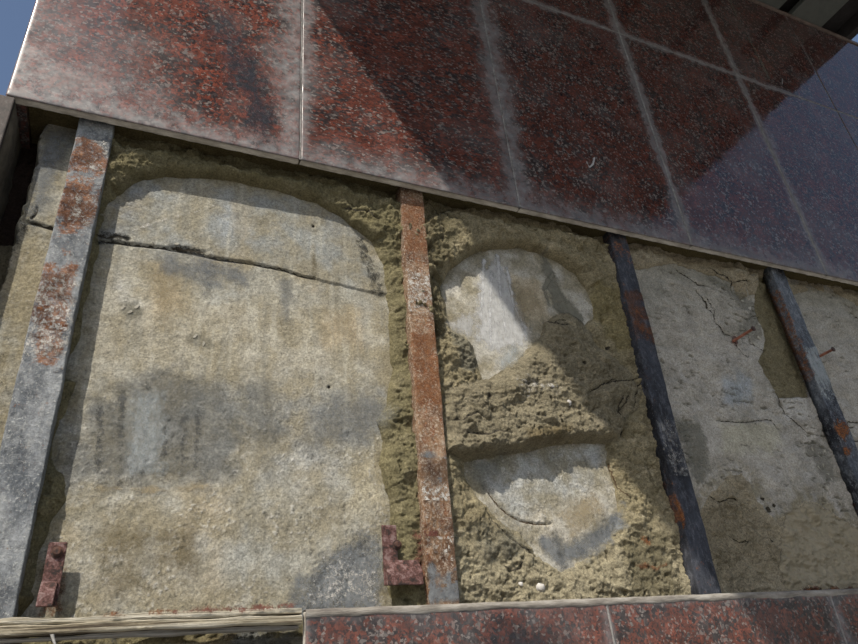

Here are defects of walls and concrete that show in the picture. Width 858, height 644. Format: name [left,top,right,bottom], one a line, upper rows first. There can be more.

crack [97,234,314,279]
crack [677,269,764,357]